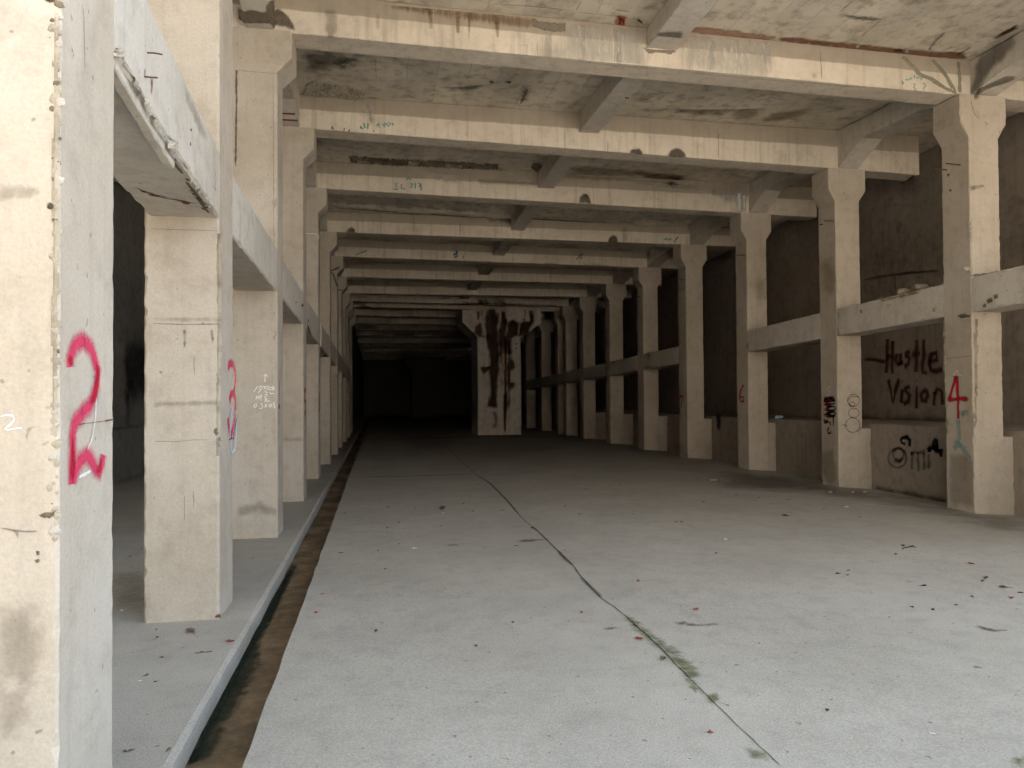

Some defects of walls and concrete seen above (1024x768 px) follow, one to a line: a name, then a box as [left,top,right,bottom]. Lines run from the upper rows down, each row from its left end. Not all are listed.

rust [692,28,965,59]
spalling [113,48,216,214]
rust [473,309,534,431]
crack [422,437,779,764]